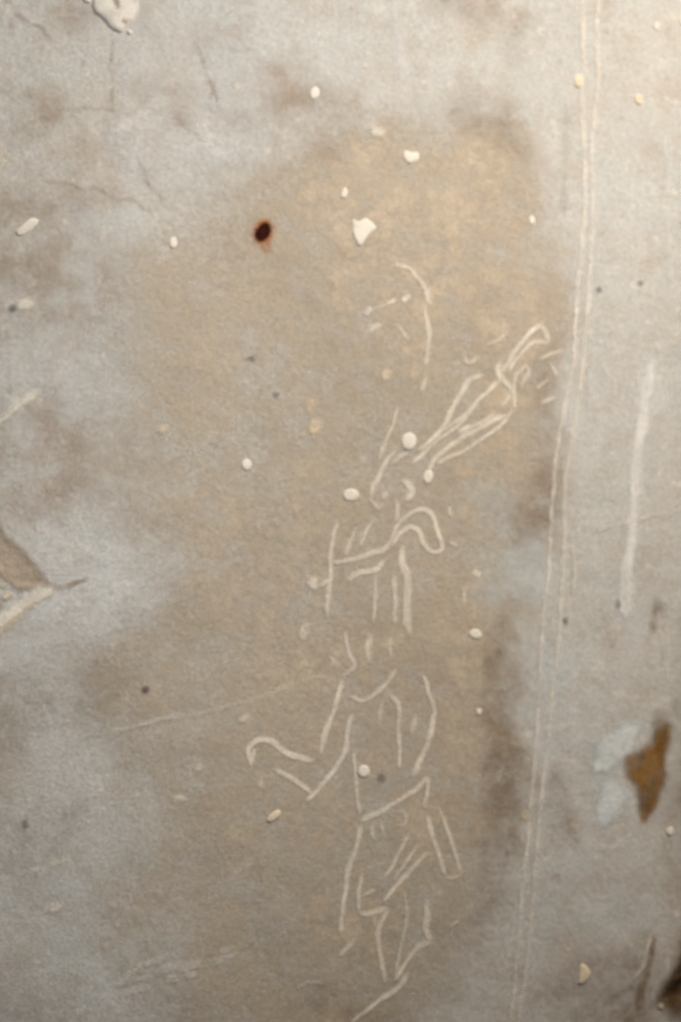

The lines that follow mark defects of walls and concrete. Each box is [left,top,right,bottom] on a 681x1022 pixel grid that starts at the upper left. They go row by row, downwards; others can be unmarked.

flaking render [84,0,139,35]
flaking render [0,532,53,633]